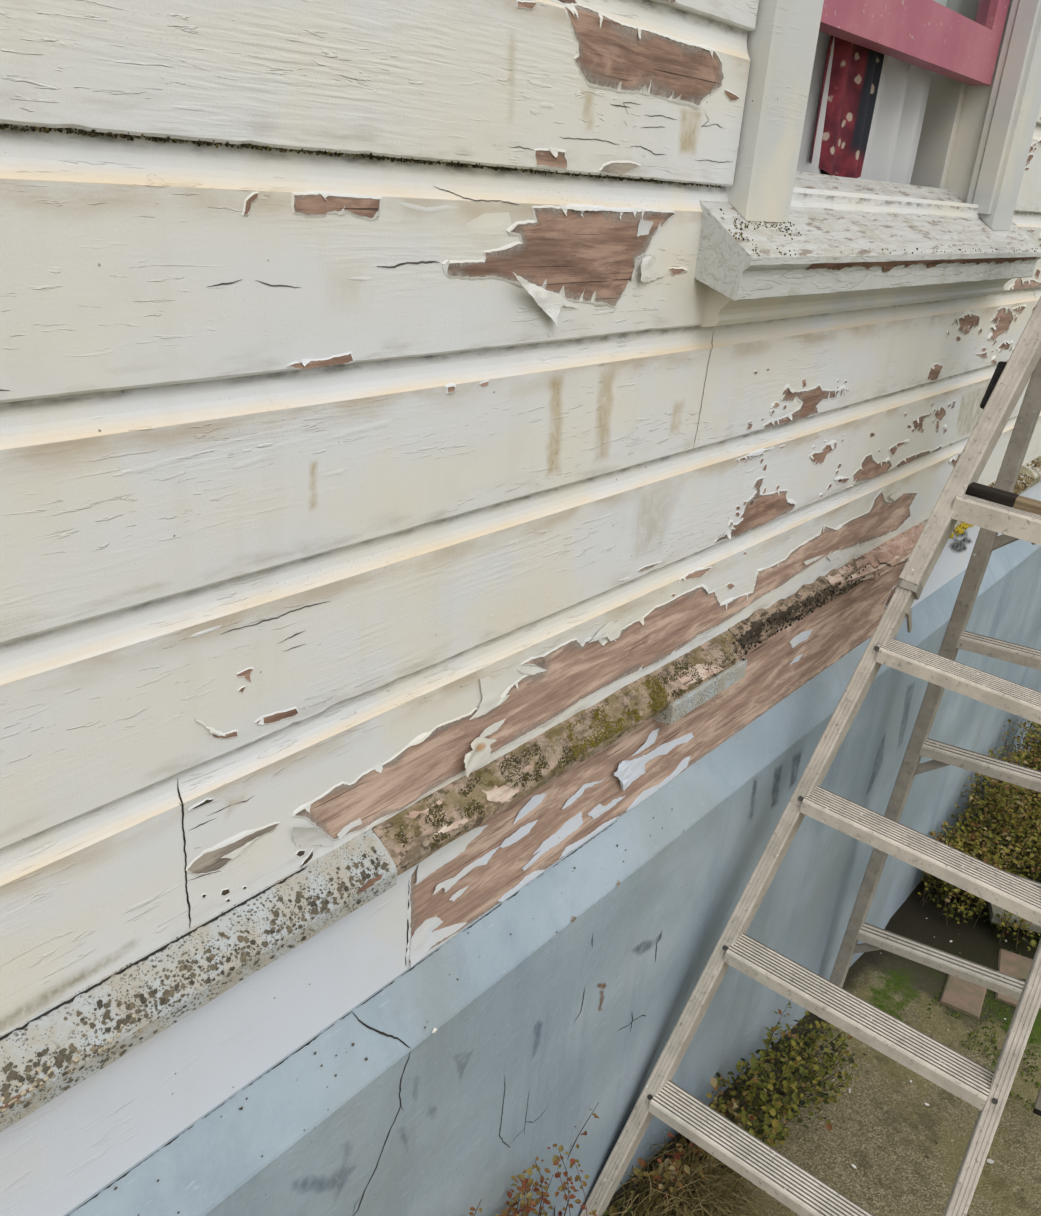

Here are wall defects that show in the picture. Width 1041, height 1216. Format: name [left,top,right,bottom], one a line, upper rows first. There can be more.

peeling [516,0,739,110]
peeling [291,190,382,221]
peeling [441,203,688,328]
peeling [746,378,849,431]
peeling [926,362,943,383]
peeling [186,400,962,967]
crack [0,778,307,1041]
crack [67,821,617,1216]